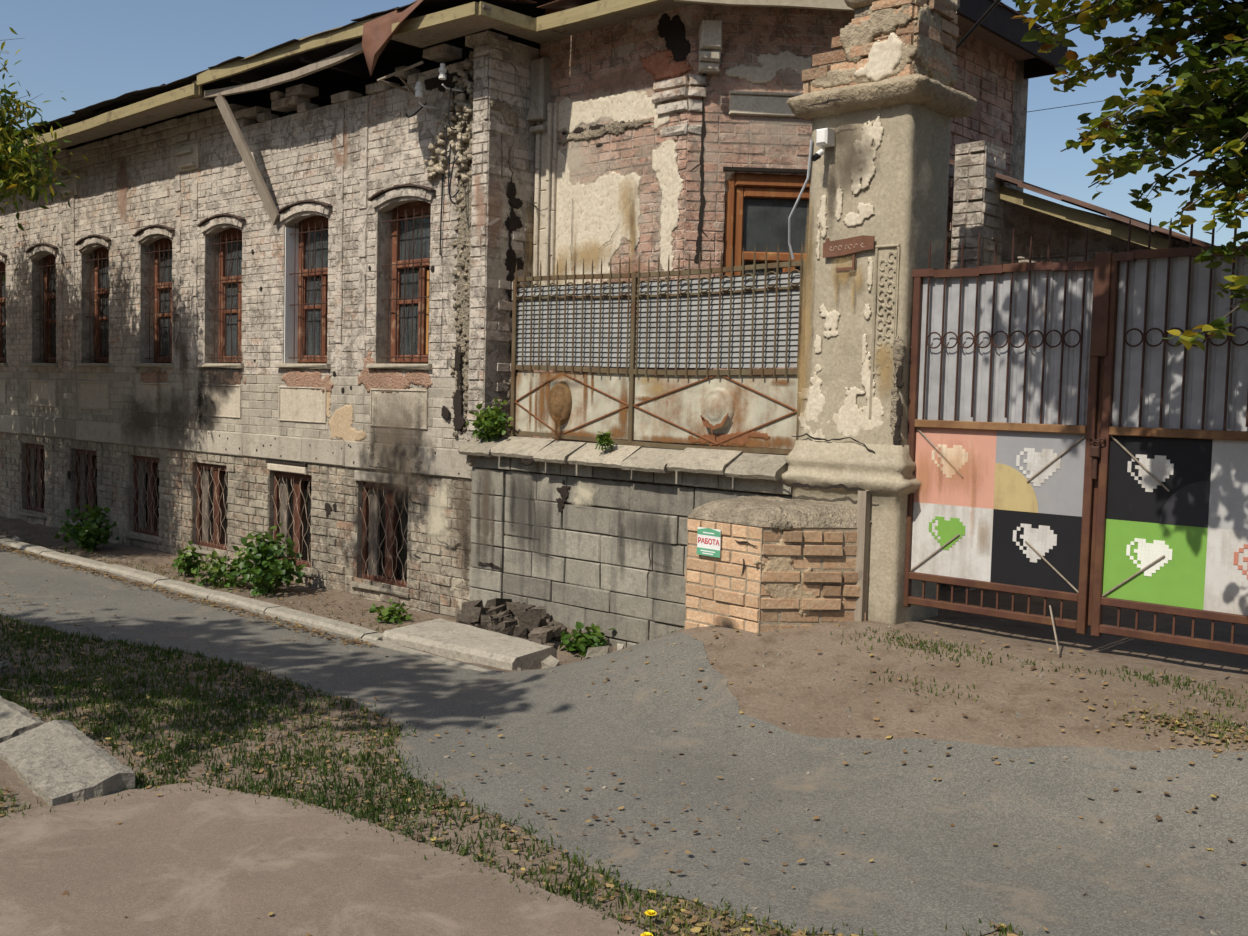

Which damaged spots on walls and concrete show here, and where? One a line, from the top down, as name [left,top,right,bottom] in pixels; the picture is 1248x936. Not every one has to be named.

flaking render [810,32,917,89]
spalling [561,121,625,147]
flaking render [816,107,884,260]
spalling [358,351,433,393]
flaking render [798,257,906,445]
peeling [281,368,374,464]
corrosion [529,371,664,439]
corrosion [644,436,706,444]
corrosion [724,436,791,448]